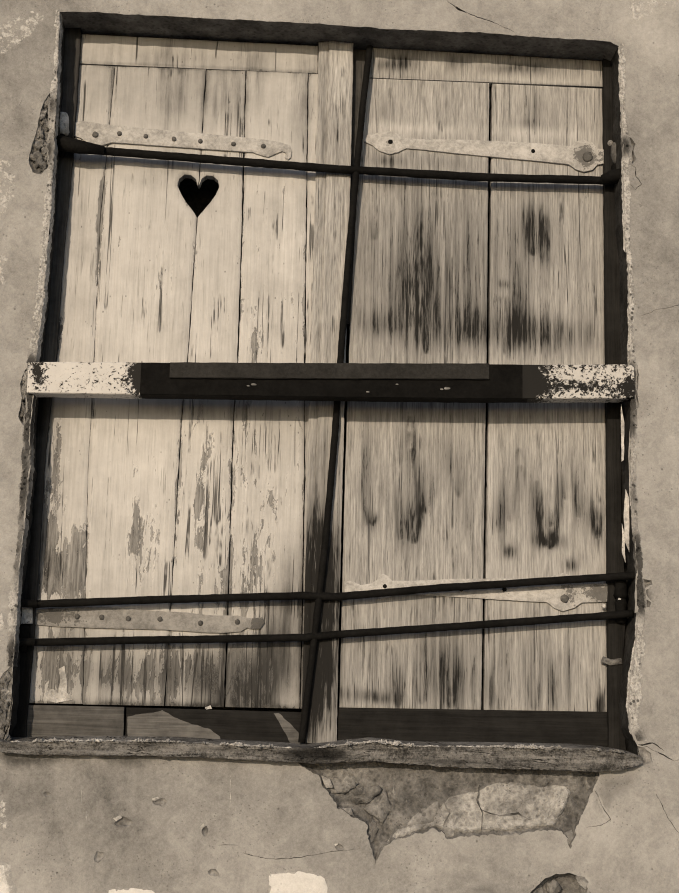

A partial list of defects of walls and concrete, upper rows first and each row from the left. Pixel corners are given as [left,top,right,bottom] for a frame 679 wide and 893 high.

crack [450,3,512,31]
flaking render [297,761,599,864]
peeling [0,865,10,893]
flaking render [530,873,591,893]